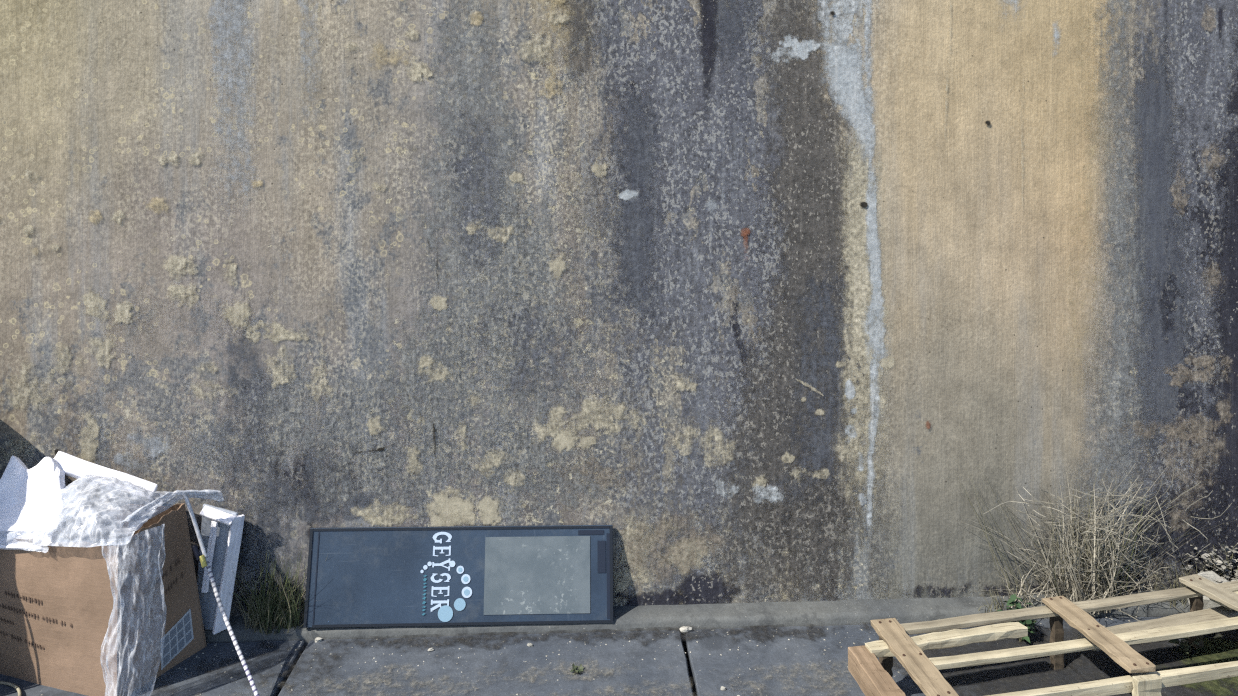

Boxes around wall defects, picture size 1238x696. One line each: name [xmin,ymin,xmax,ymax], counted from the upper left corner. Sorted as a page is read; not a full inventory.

water stain [565,0,894,606]
water stain [914,584,967,598]
water stain [984,578,1050,596]
water stain [1072,0,1238,592]